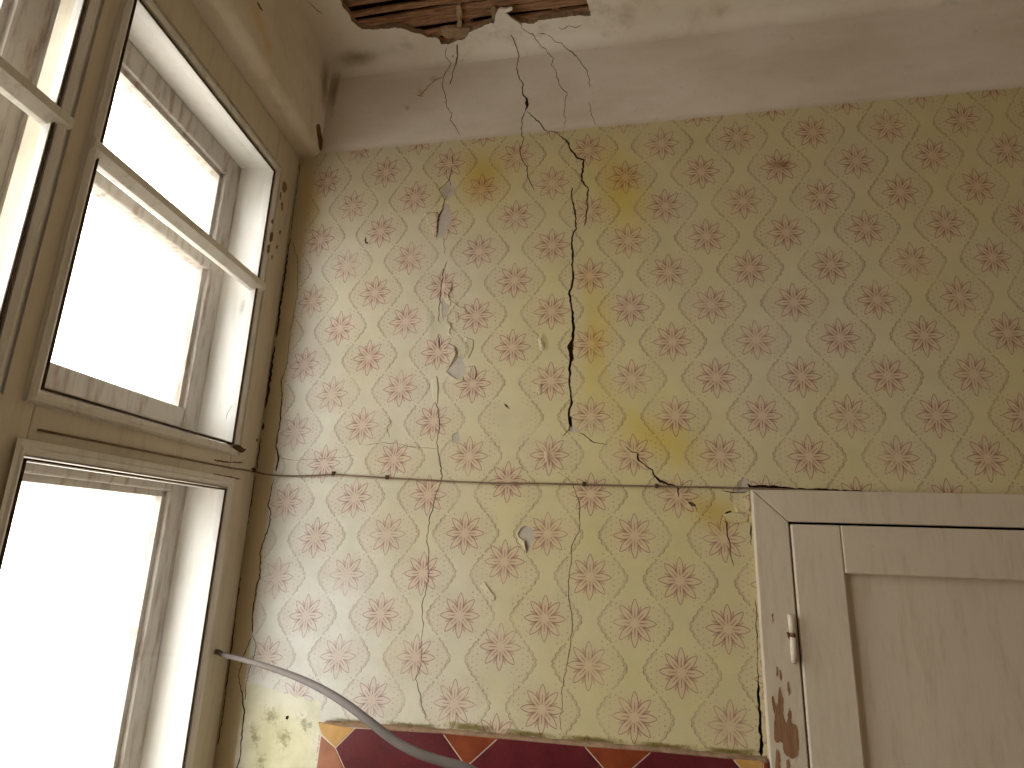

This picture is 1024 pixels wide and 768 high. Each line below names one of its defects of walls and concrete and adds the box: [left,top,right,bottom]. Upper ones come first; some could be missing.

spalling [341,0,591,44]
crack [418,44,461,348]
crack [492,22,680,497]
crack [214,165,443,768]
crack [558,472,580,731]
crack [722,517,752,566]
crack [755,601,764,756]
peeling [772,667,799,768]